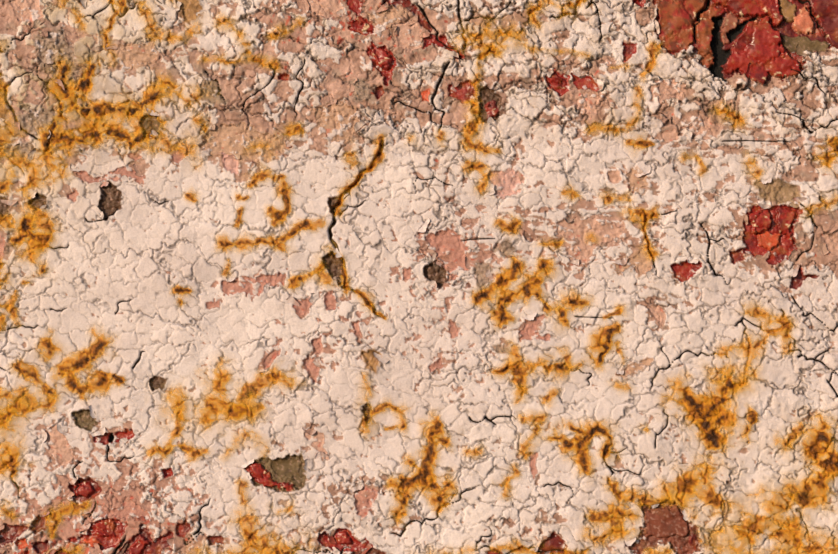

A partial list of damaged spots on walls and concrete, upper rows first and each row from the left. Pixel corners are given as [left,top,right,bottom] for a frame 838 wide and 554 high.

crack [394,0,515,132]
peeling [633,0,838,85]
corrosion [0,61,198,274]
crack [329,140,384,292]
peeling [729,178,819,290]
corrosion [472,257,589,327]
corrosion [0,329,125,429]
crack [650,346,727,390]
corrosion [665,307,793,452]
crack [781,297,838,397]
peeling [240,426,329,492]
peeling [624,501,706,554]